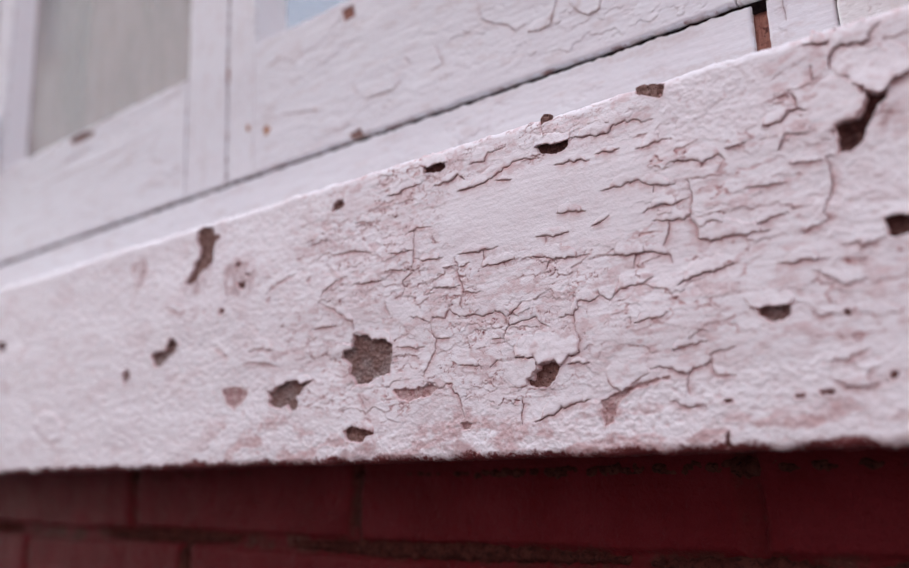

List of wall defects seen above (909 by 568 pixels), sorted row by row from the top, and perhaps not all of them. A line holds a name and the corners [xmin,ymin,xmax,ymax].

crack [464,0,601,34]
crack [804,17,880,80]
peeling [805,39,909,153]
crack [889,71,909,86]
peeling [533,114,570,154]
peeling [884,201,909,237]
peeling [187,227,220,284]
crack [266,92,883,417]
peeling [742,289,795,322]
peeling [328,325,392,394]
peeling [503,328,580,388]
crack [518,388,591,424]